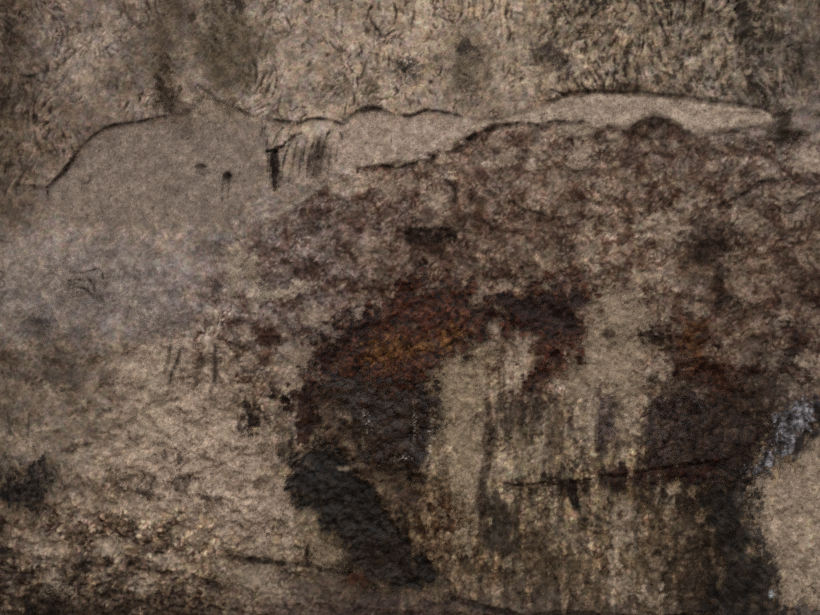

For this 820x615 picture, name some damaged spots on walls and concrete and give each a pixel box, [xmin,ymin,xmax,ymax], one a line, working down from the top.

crack [14,115,166,194]
crack [266,105,461,138]
crack [366,120,589,168]
crack [559,89,761,108]
crack [436,179,557,220]
corrosion [243,254,604,572]
water stain [588,390,619,472]
corrosion [528,306,820,511]
water stain [136,446,191,501]
water stain [283,379,455,615]
water stain [476,393,609,615]
water stain [625,393,820,615]